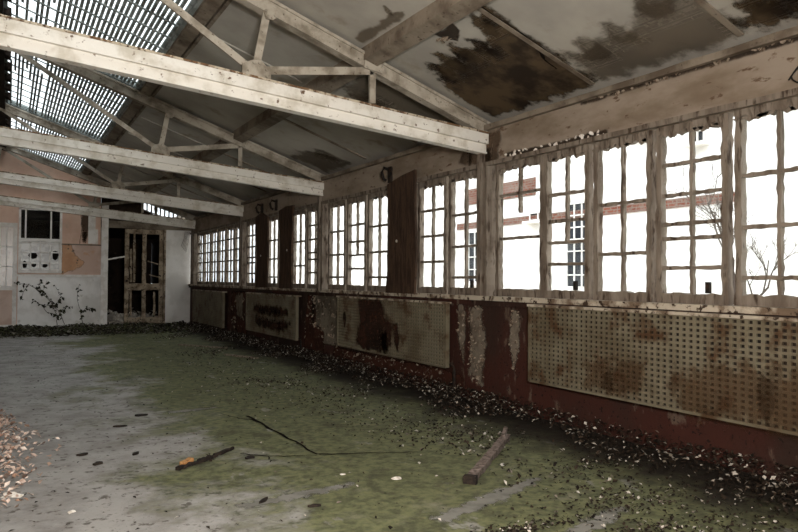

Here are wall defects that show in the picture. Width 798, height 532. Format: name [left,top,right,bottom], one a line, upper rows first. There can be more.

leakage [357,6,404,42]
leakage [427,0,798,117]
peeling [62,244,84,274]